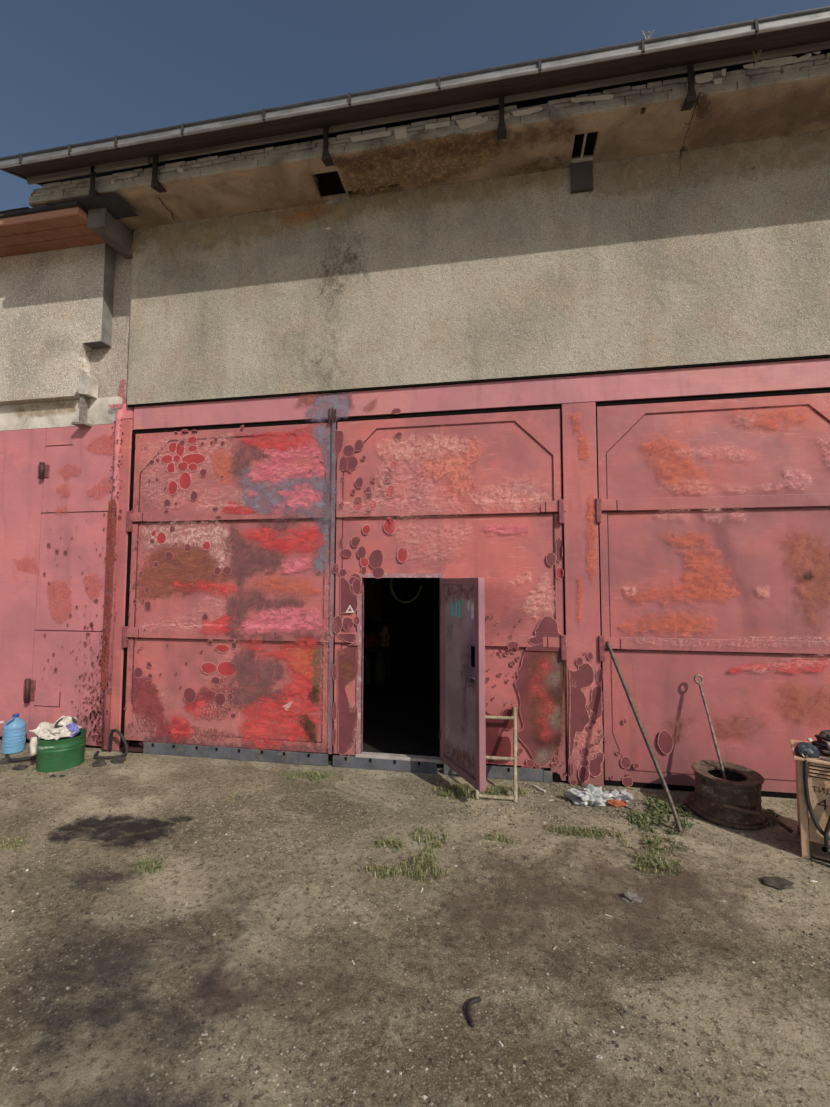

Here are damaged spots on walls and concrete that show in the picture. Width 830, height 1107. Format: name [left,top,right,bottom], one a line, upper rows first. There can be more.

peeling [743,51,821,70]
peeling [695,68,727,84]
peeling [571,94,614,103]
peeling [504,106,542,119]
peeling [425,115,488,130]
peeling [350,127,407,142]
peeling [131,425,549,756]
peeling [485,537,640,787]